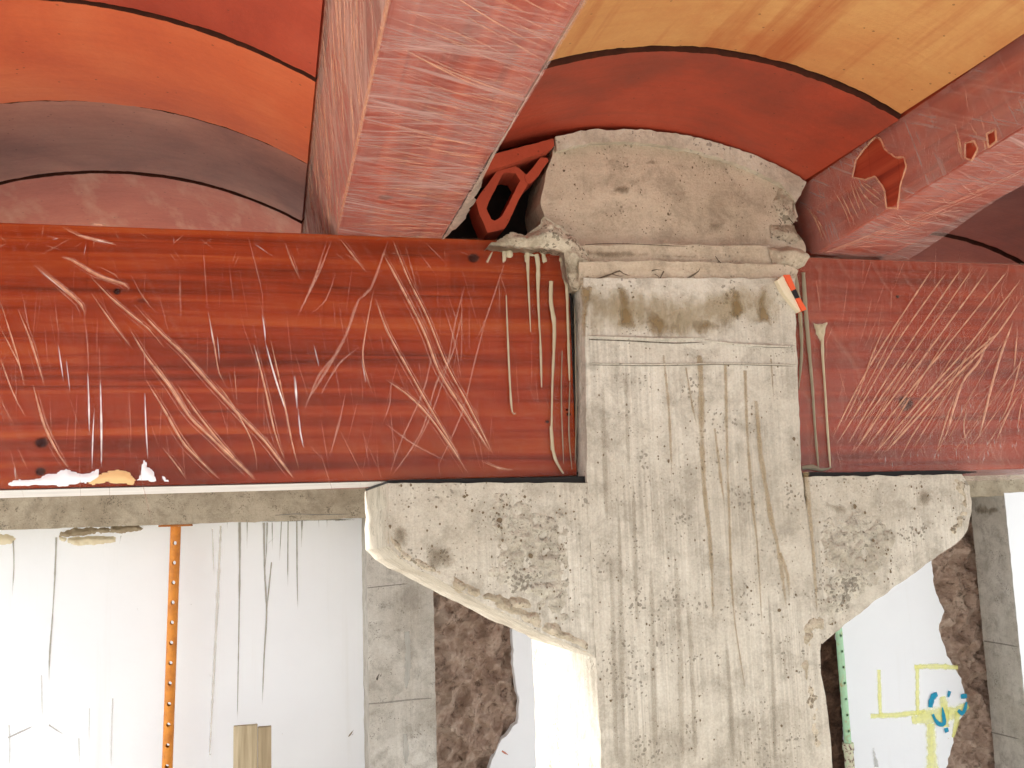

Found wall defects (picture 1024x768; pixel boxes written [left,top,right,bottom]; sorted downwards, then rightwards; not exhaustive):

water stain [602,291,742,335]
water stain [757,297,769,321]
peeling [88,470,136,485]
peeling [0,534,16,545]
peeling [59,526,143,546]
spalling [451,493,588,652]